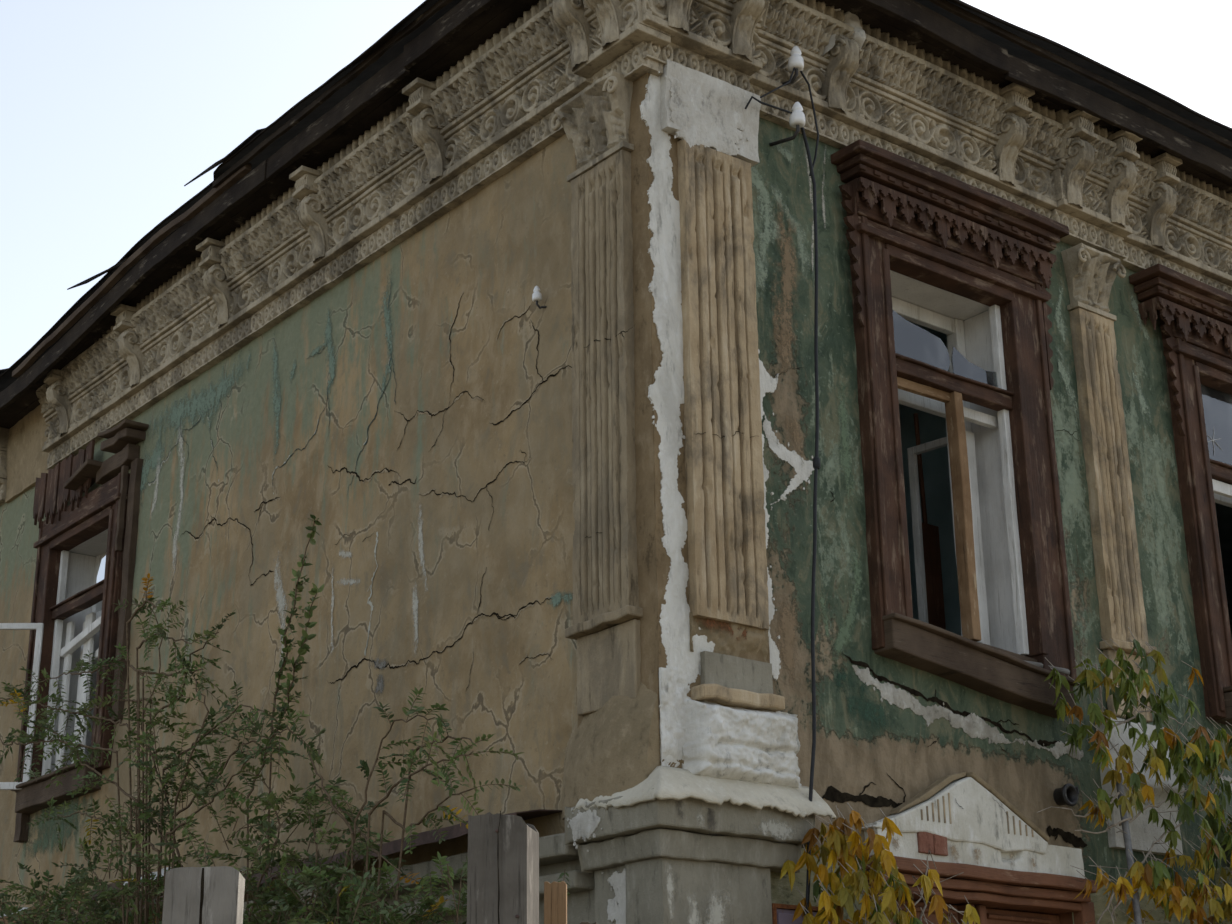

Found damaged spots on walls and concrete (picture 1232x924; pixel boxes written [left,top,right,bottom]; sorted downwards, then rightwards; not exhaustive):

leakage [140,353,250,562]
crack [181,292,636,586]
peeling [640,71,749,767]
peeling [758,349,814,549]
leakage [274,564,287,658]
leakage [418,512,426,574]
crack [329,530,573,689]
peeling [767,565,781,681]
spalling [852,665,1084,761]